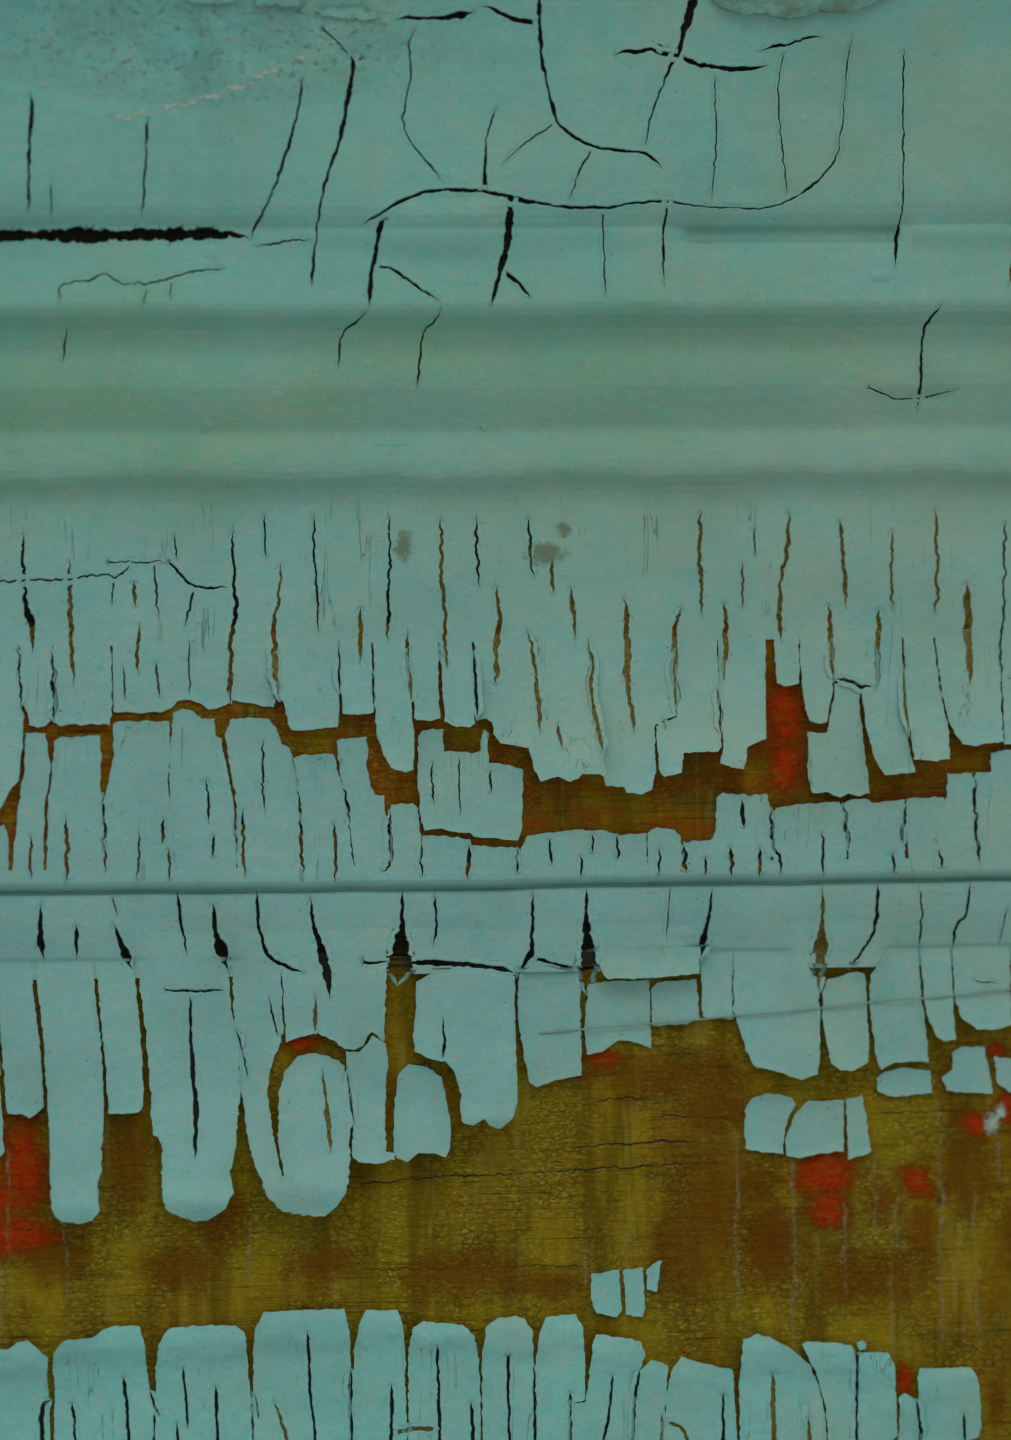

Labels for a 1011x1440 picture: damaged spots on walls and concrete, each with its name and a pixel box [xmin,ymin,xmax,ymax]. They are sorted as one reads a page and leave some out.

peeling [255,0,378,20]
crack [0,25,365,363]
crack [333,0,853,390]
crack [889,46,909,268]
crack [0,507,796,754]
peeling [0,630,1011,877]
crack [822,506,1011,737]
crack [23,736,1010,1161]
peeling [0,946,1011,1224]
crack [117,1330,729,1440]
peeling [0,1309,982,1440]
peeling [591,1261,662,1317]